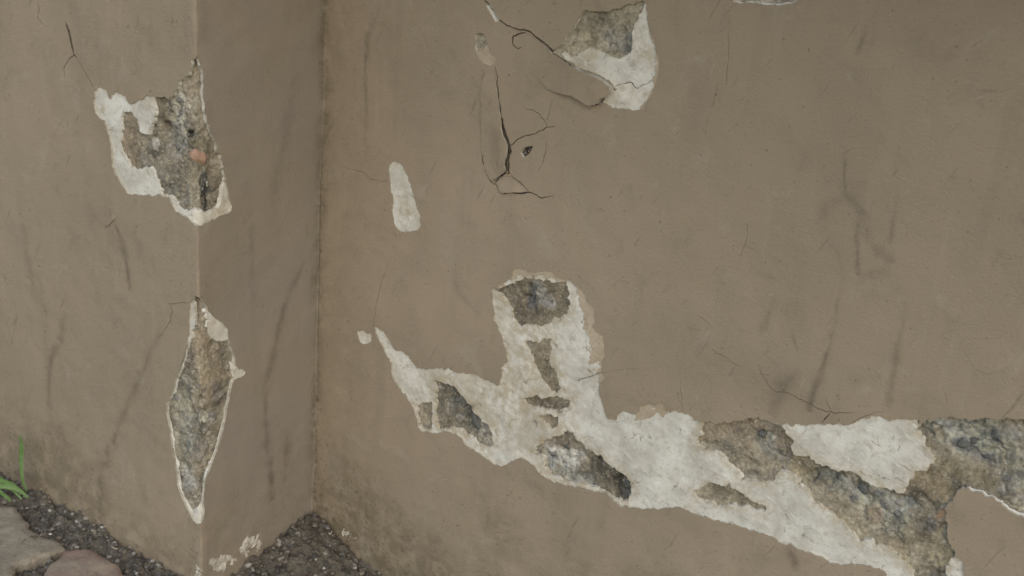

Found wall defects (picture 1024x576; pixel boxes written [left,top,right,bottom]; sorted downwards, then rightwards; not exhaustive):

crack [485,1,554,52]
flaking render [512,1,659,111]
flaking render [89,60,231,225]
peeling [389,161,424,232]
crack [482,67,555,199]
flaking render [168,296,244,523]
flaking render [358,269,1024,576]